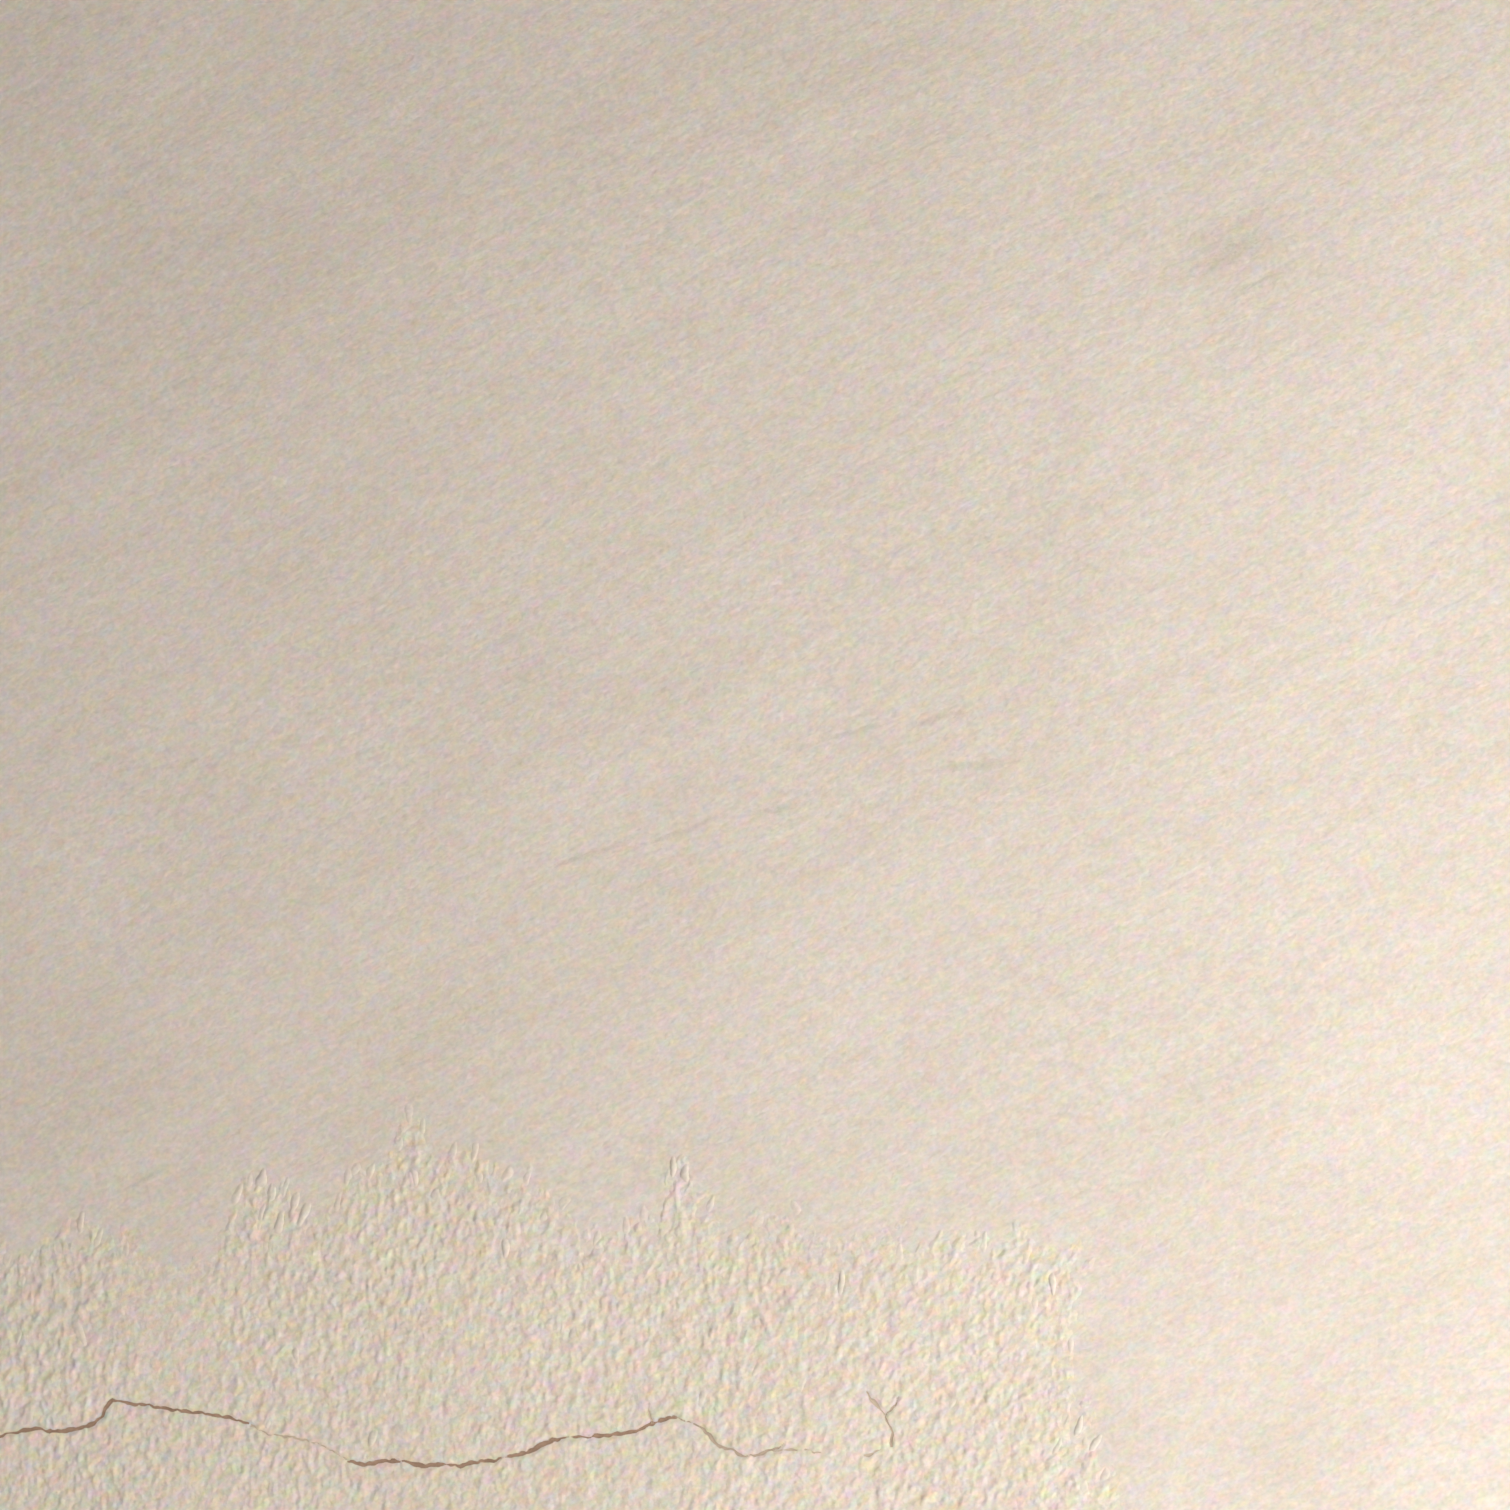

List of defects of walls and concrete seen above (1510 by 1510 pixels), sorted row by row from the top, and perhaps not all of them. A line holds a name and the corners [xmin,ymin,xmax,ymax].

flaking render [0,1096,1131,1510]
crack [0,1398,821,1469]
crack [864,1391,900,1457]